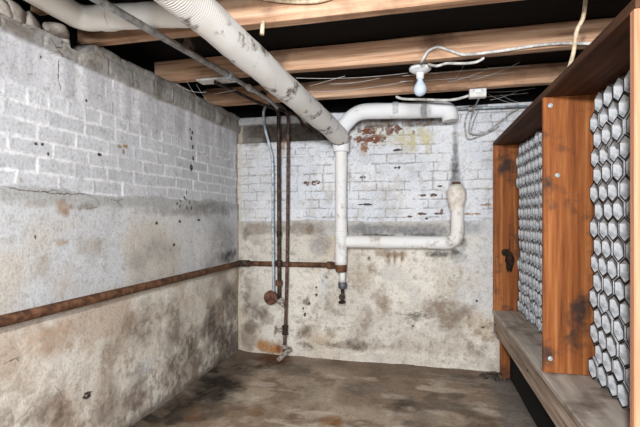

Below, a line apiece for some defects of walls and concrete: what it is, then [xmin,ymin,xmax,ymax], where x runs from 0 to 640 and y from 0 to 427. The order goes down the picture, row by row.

peeling [350,125,402,152]
crack [3,186,122,209]
damp [356,226,390,236]
damp [398,227,435,236]
rust [259,343,286,363]